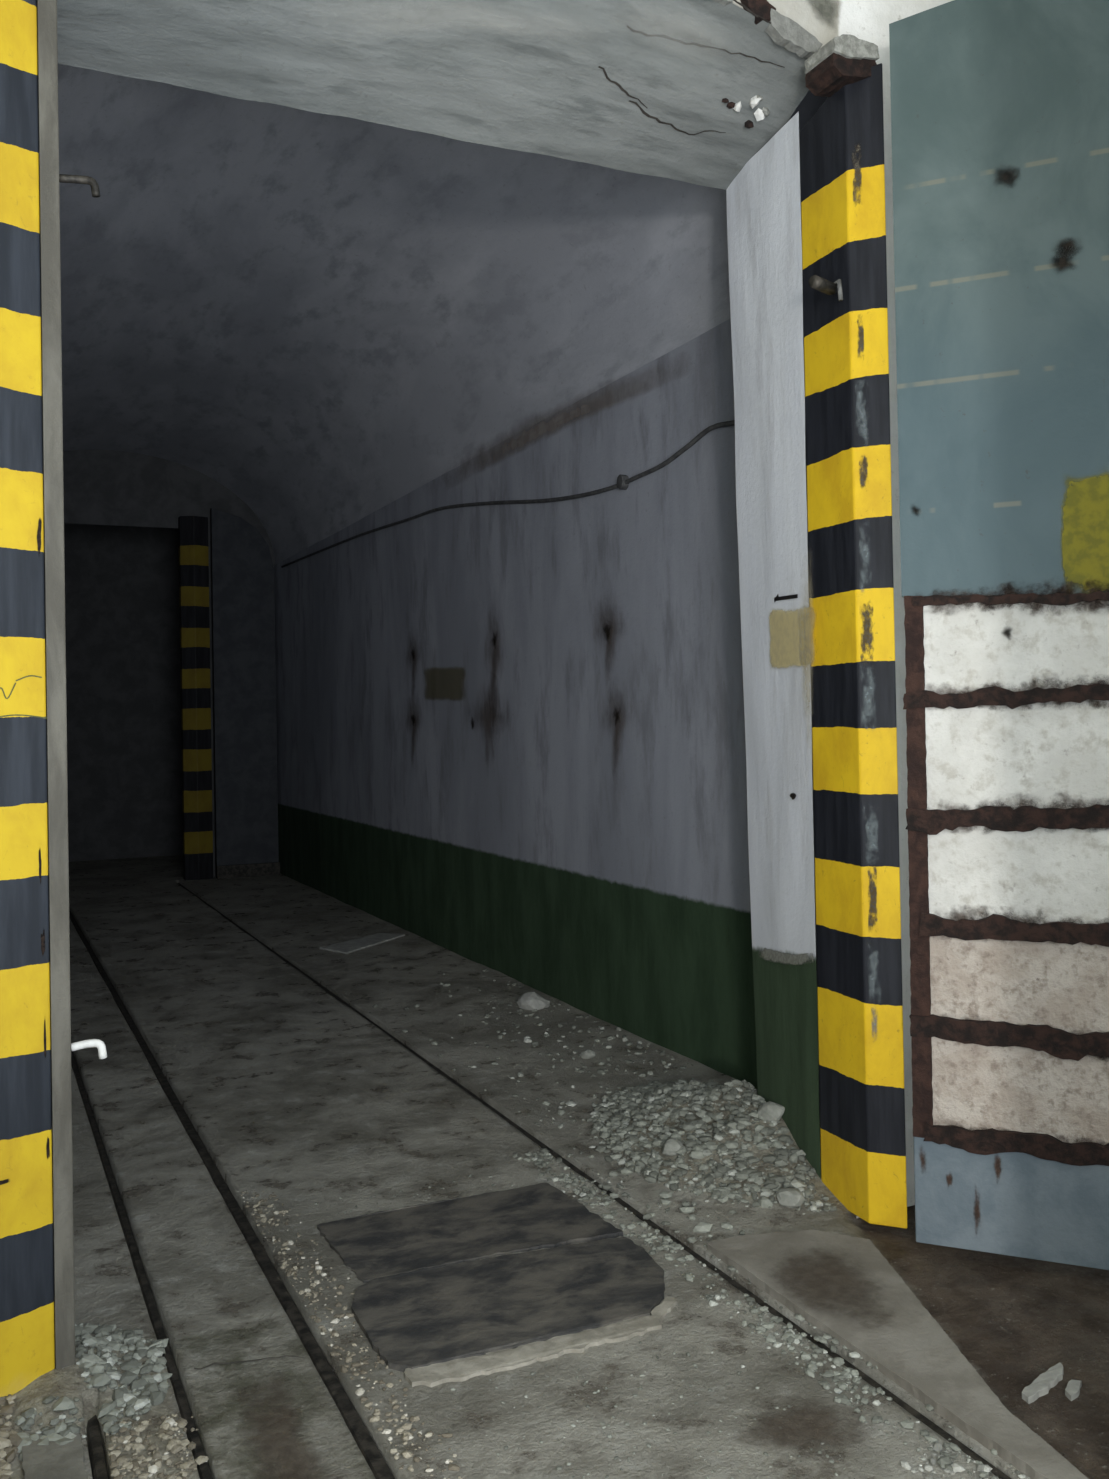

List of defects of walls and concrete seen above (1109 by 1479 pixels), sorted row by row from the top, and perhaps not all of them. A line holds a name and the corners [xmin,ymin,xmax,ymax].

crack [627,25,785,68]
crack [733,0,771,24]
spalling [712,0,880,97]
crack [598,66,726,135]